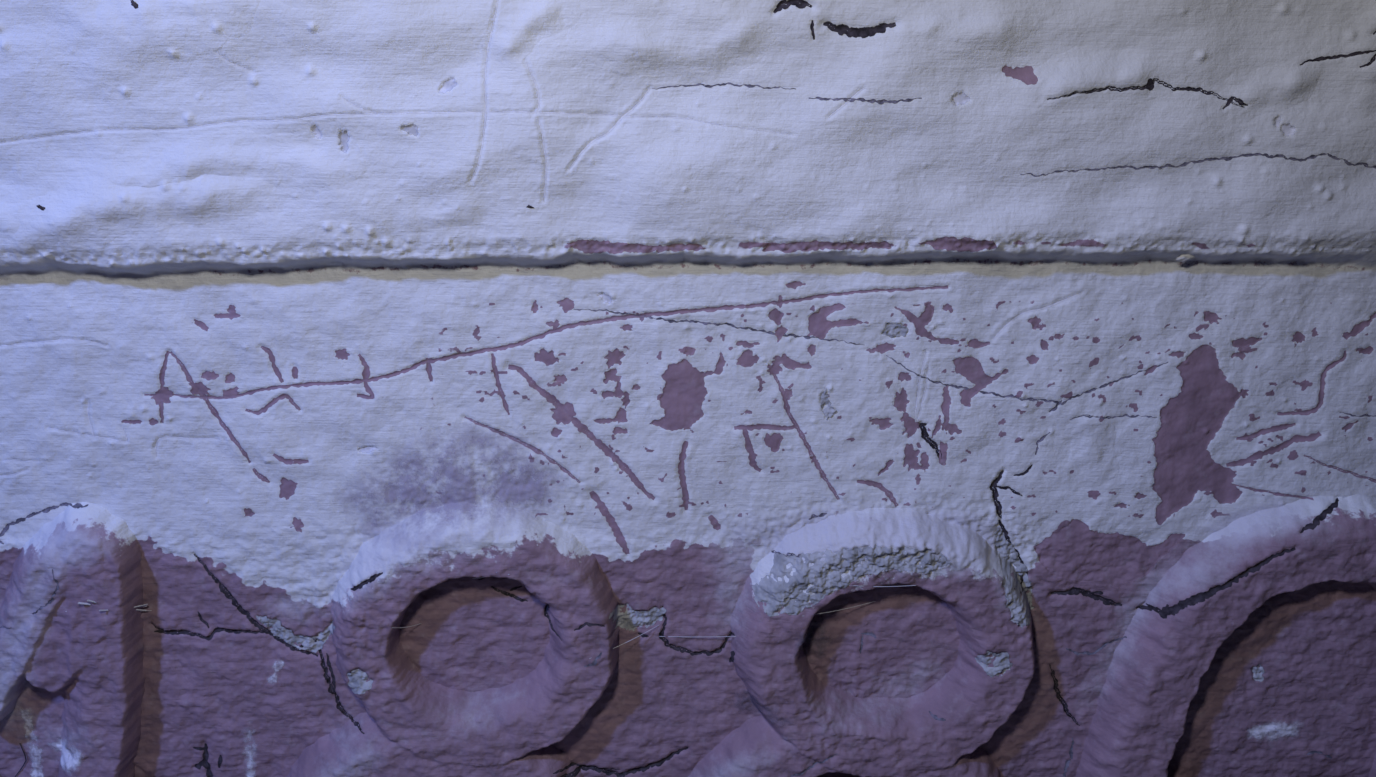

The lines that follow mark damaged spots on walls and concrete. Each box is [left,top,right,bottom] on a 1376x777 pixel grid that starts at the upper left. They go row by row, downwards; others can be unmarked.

crack [773,0,896,40]
crack [1300,31,1376,68]
crack [1047,78,1248,109]
crack [1020,153,1376,177]
peeling [534,348,567,384]
peeling [550,401,576,437]
peeling [594,348,640,435]
peeling [650,281,1008,476]
peeling [994,311,1262,629]
crack [574,309,1339,777]
spalling [752,545,951,617]
crack [153,554,364,734]